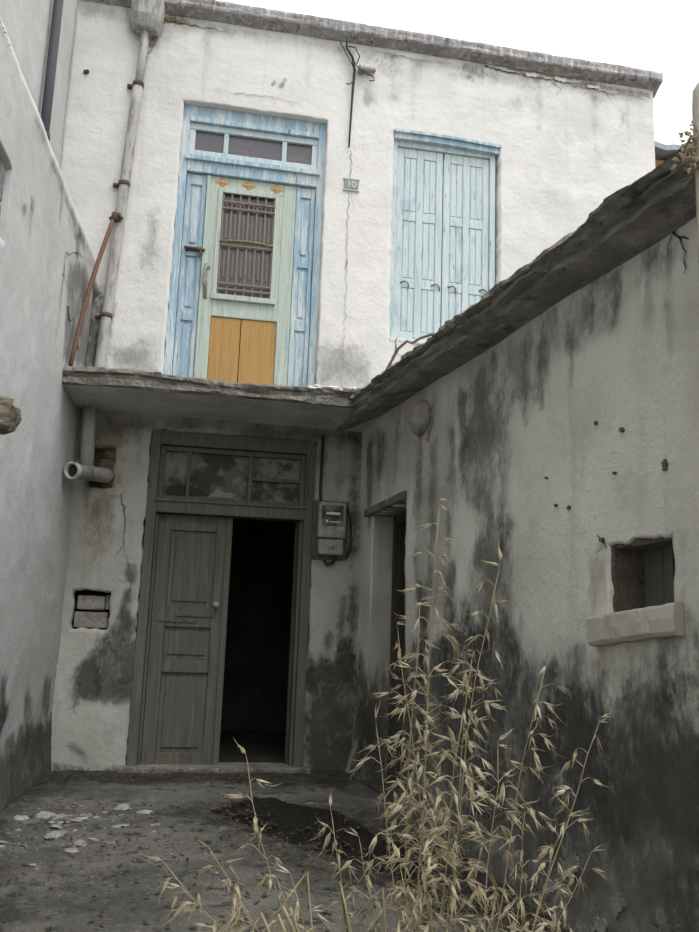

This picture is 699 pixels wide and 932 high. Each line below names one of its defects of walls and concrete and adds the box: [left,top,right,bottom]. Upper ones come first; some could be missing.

crack [667,231,689,273]
leakage [75,570,135,704]
leakage [0,678,8,729]
leakage [303,485,699,932]
leakage [0,718,52,812]